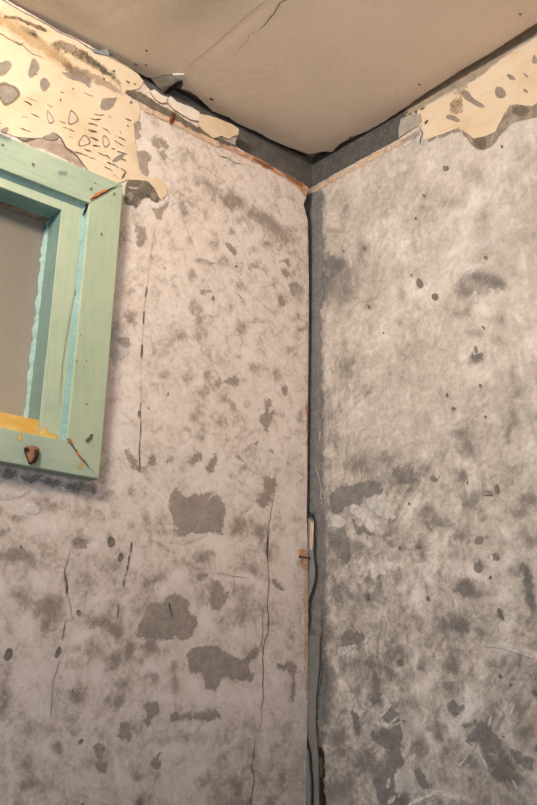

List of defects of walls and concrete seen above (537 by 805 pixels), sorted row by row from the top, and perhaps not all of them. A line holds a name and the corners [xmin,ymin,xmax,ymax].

water stain [4,15,47,38]
water stain [52,40,121,87]
crack [185,0,286,69]
peeling [0,0,170,220]
peeling [125,38,537,749]
crack [62,549,72,639]
crack [250,498,274,805]
peeling [117,722,132,742]